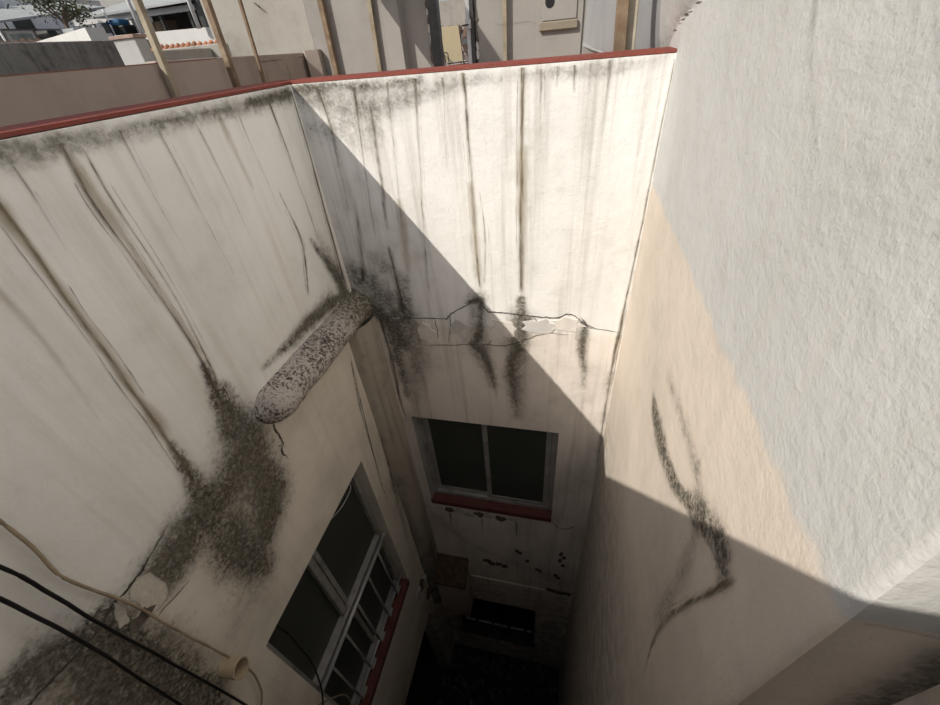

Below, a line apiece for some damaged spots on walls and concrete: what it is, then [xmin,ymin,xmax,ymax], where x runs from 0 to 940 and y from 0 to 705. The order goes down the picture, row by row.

damp [0,203,74,309]
damp [62,146,117,236]
damp [276,98,422,412]
damp [507,67,531,401]
damp [467,296,494,381]
crack [379,299,621,346]
damp [578,322,587,367]
damp [611,289,629,373]
damp [100,307,286,589]
damp [0,601,229,705]
damp [857,655,940,705]